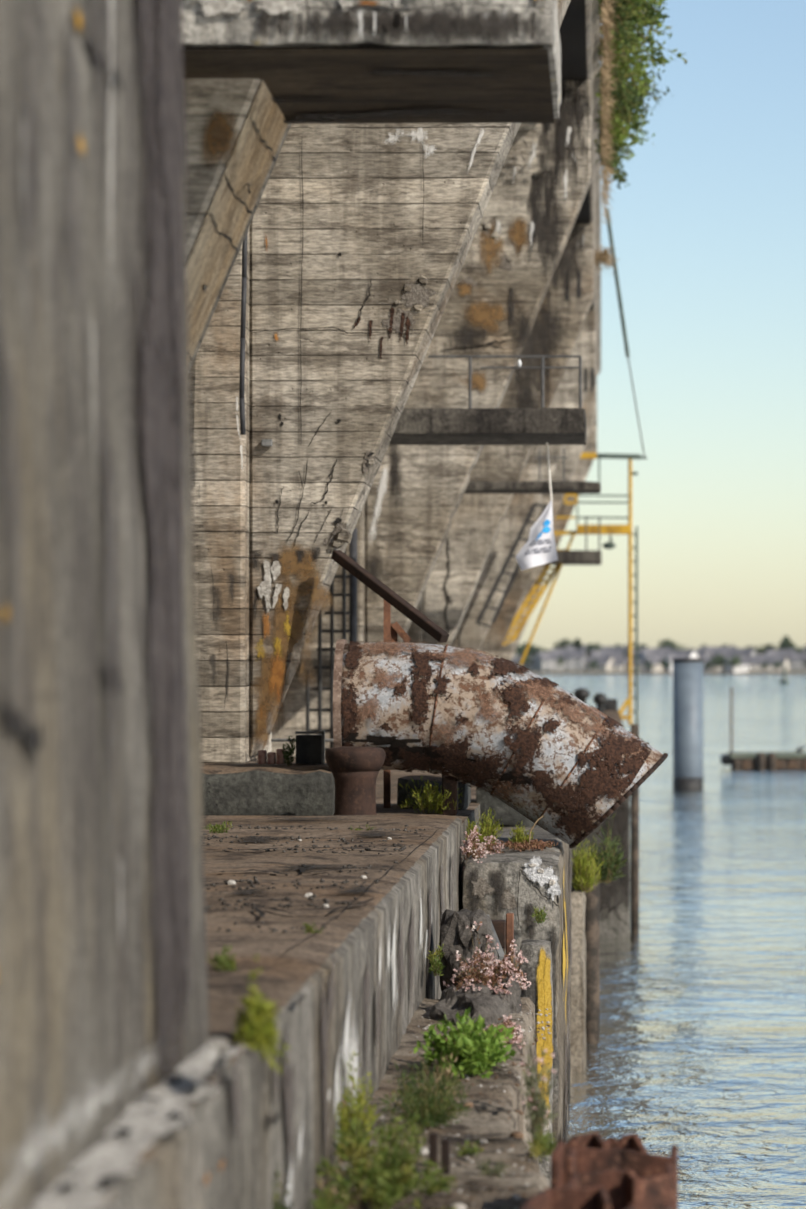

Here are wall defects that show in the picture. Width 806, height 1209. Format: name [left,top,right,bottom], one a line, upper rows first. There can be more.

water stain [258,7,536,39]
crack [210,174,252,251]
corrosion [480,219,528,271]
water stain [508,79,591,408]
crack [252,118,508,547]
water stain [449,325,486,352]
corrosion [467,372,486,391]
corrosion [256,546,331,746]